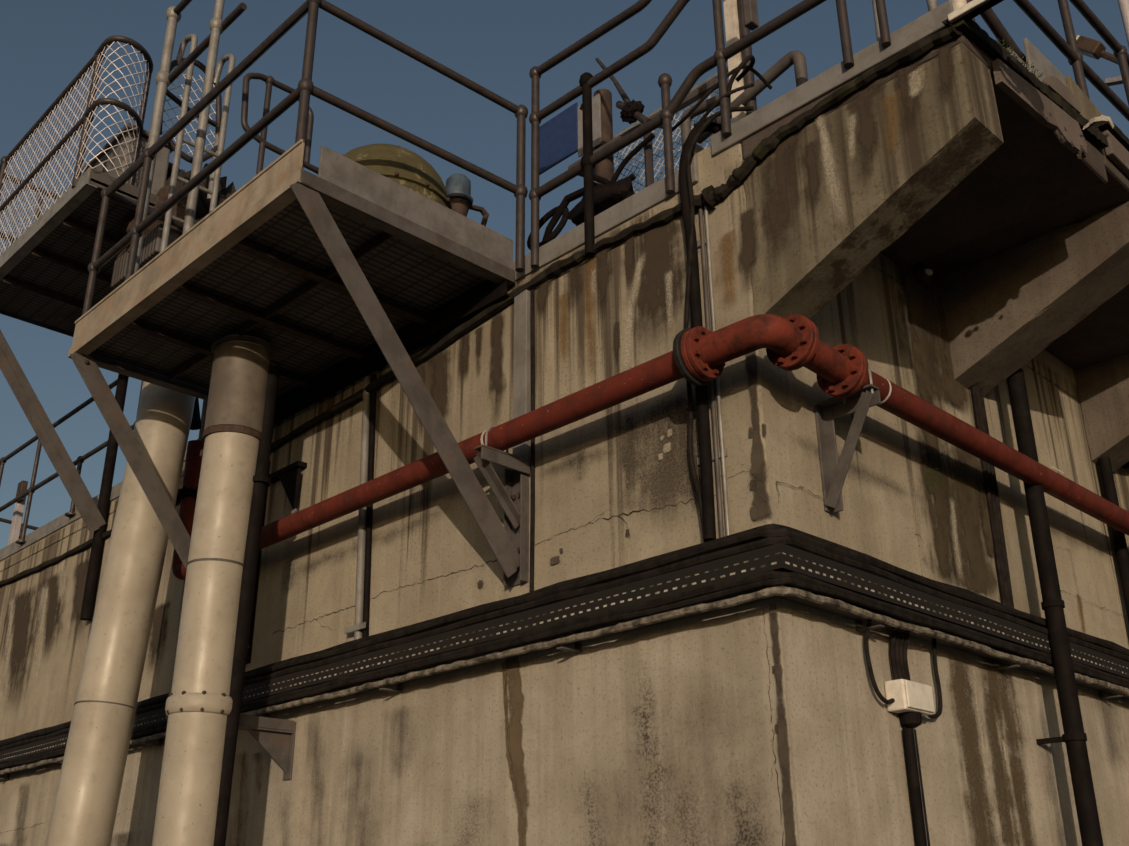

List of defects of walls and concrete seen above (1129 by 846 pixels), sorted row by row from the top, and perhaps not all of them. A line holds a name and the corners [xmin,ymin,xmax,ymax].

water stain [847,83,882,175]
water stain [895,62,921,121]
water stain [738,117,839,279]
water stain [418,314,503,418]
water stain [622,395,701,513]
crack [538,471,749,544]
water stain [945,447,996,595]
water stain [3,560,89,693]
crack [272,560,497,634]
water stain [971,657,1034,846]
water stain [731,786,763,846]